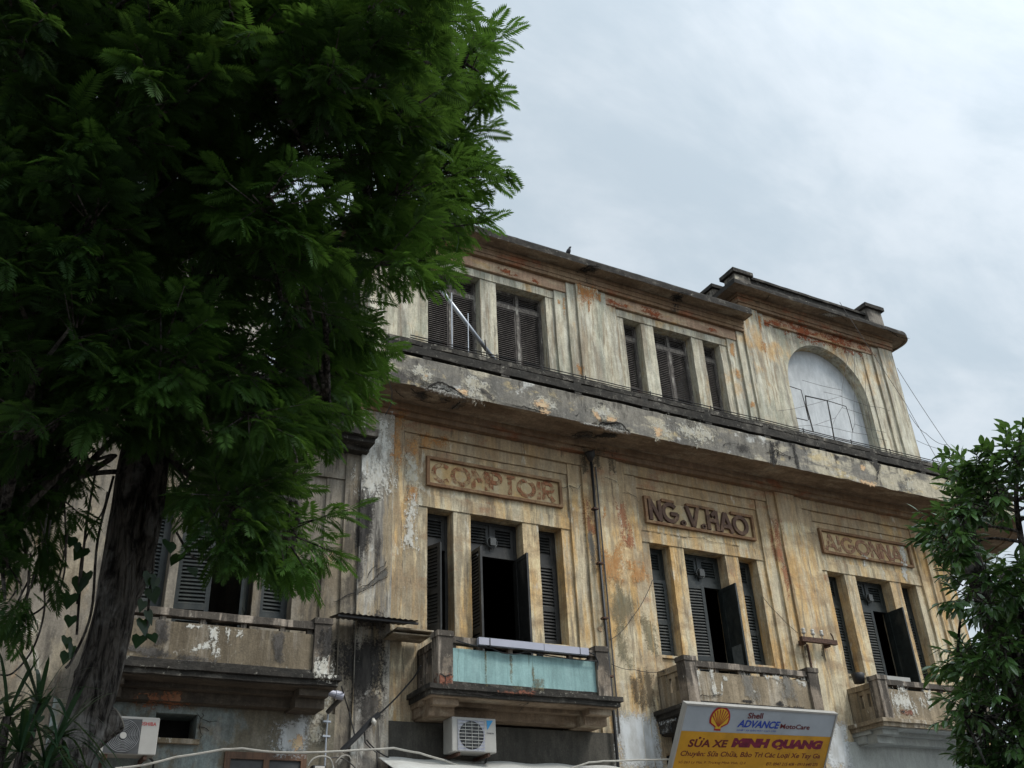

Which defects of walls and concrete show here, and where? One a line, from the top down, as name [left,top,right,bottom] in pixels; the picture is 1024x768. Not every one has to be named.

rust [577,282,628,312]
rust [754,311,878,361]
peeling [530,394,557,414]
peeling [569,402,630,446]
peeling [351,410,449,553]
peeling [186,624,243,659]
peeling [313,655,336,683]
water stain [318,610,390,728]